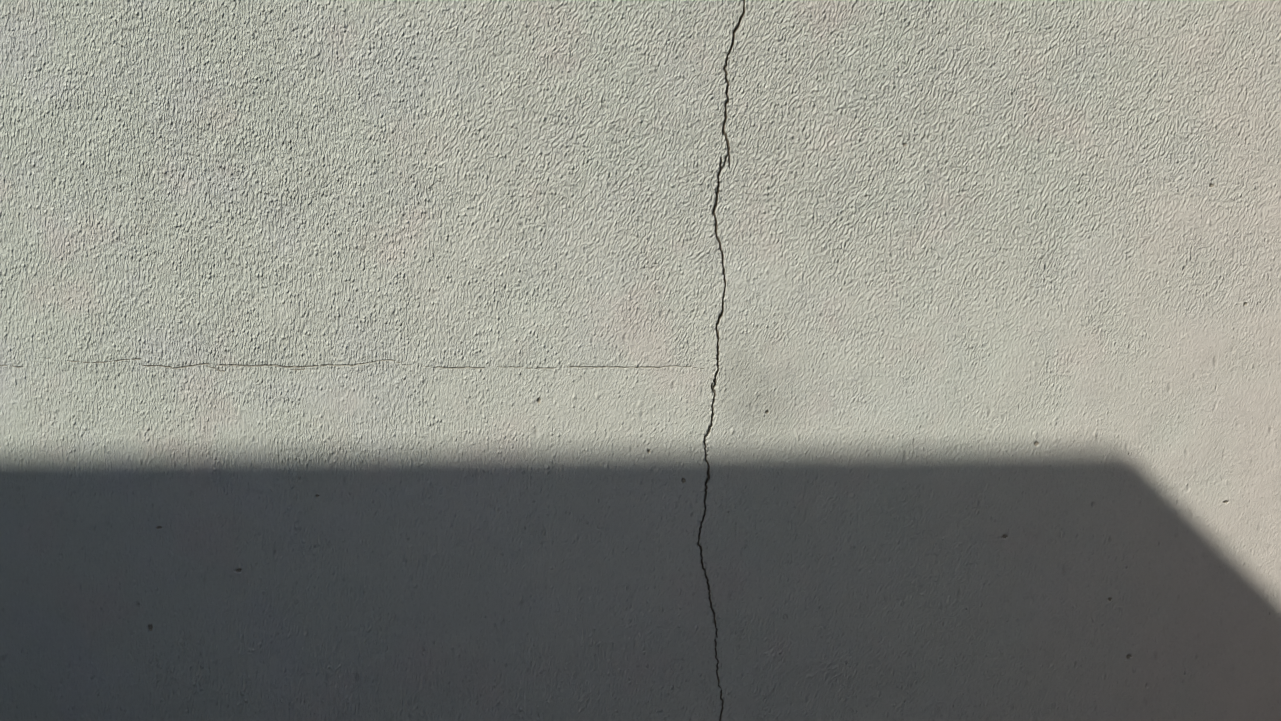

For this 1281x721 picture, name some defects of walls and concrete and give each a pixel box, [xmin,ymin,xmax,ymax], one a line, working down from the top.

crack [0,0,745,721]